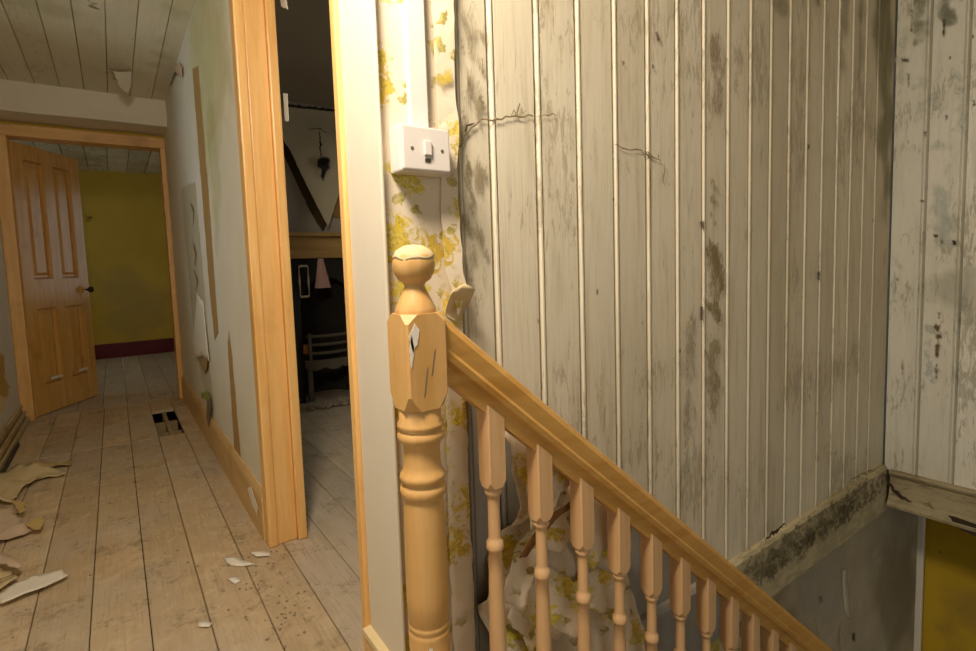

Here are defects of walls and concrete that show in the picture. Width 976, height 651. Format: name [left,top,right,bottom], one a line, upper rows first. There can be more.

water stain [942,4,955,36]
crack [459,103,555,148]
crack [615,144,665,185]
flaking render [0,353,10,415]
water stain [740,475,889,586]